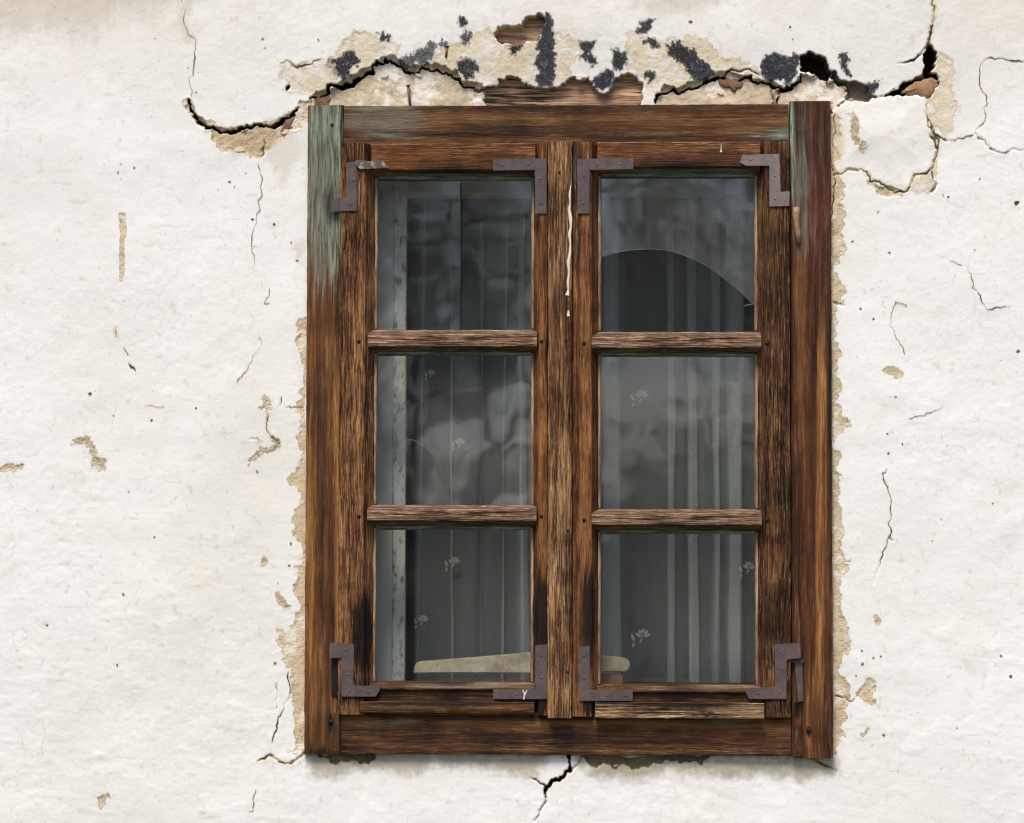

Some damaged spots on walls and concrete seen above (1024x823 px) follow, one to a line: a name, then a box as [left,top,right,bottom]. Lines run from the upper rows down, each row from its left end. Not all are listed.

crack [902,1,935,63]
crack [181,0,486,267]
crack [831,57,1024,226]
peeling [182,14,958,755]
peeling [0,463,24,472]
peeling [71,436,106,472]
crack [879,472,893,566]
crack [260,672,302,764]
crack [532,755,582,820]